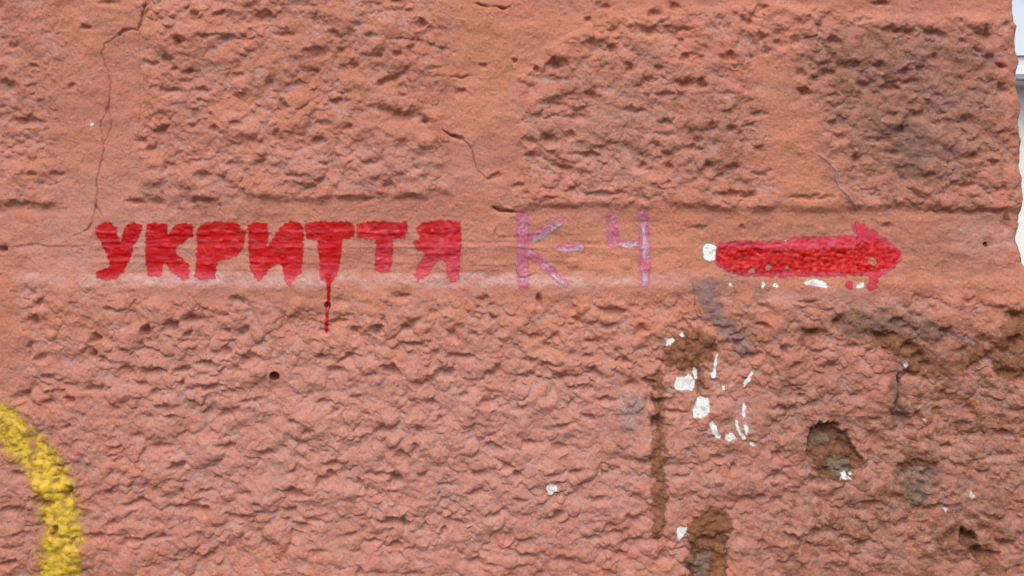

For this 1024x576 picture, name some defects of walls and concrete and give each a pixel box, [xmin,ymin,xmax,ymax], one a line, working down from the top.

flaking render [805,422,864,483]
flaking render [897,459,948,511]
flaking render [677,506,733,576]